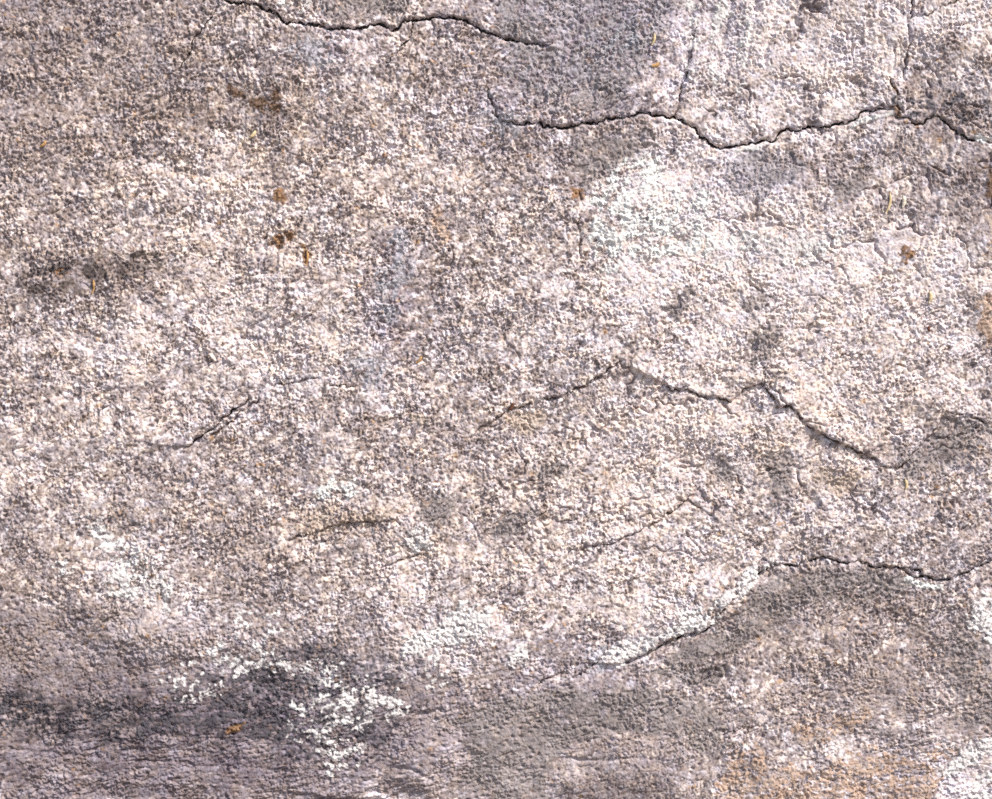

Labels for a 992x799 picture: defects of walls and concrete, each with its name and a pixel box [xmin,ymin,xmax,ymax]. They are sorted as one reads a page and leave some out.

crack [180,0,553,71]
crack [485,0,992,152]
crack [470,361,620,438]
crack [667,362,985,468]
crack [591,501,712,547]
crack [538,556,991,684]
leakage [0,636,420,770]